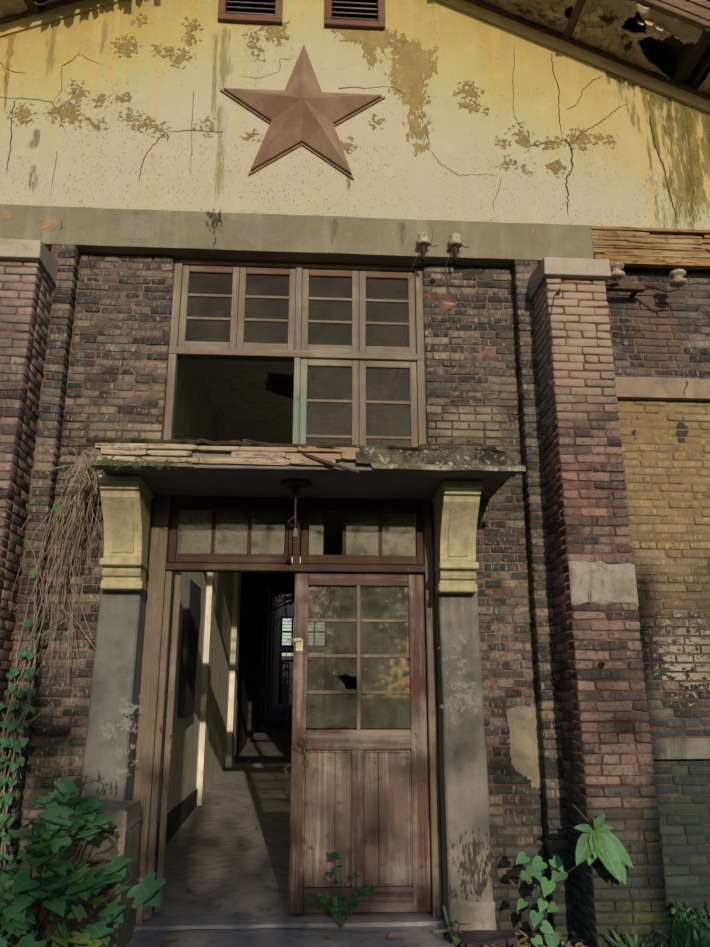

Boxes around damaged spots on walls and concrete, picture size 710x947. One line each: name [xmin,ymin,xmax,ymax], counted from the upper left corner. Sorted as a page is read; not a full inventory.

peeling [110,12,203,69]
peeling [241,20,289,62]
flaking render [636,19,679,39]
crack [0,53,99,175]
peeling [6,79,170,138]
crack [139,90,217,184]
peeling [192,116,219,137]
peeling [324,27,439,156]
peeling [452,80,489,115]
crack [512,47,676,216]
damp [606,72,710,229]